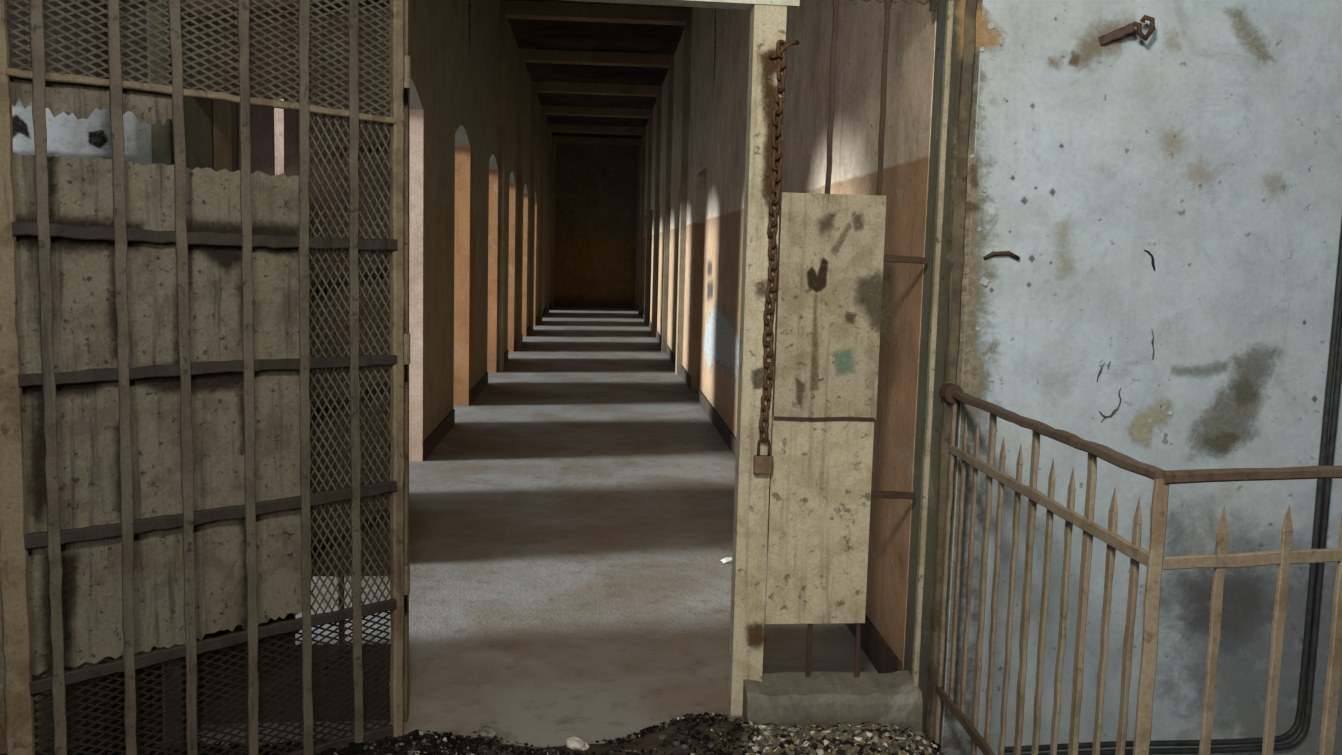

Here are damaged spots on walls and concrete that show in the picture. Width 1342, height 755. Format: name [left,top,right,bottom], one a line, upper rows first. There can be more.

corrosion [1050,25,1128,65]
damp [942,181,996,750]
damp [1174,349,1275,457]
damp [1183,548,1342,755]